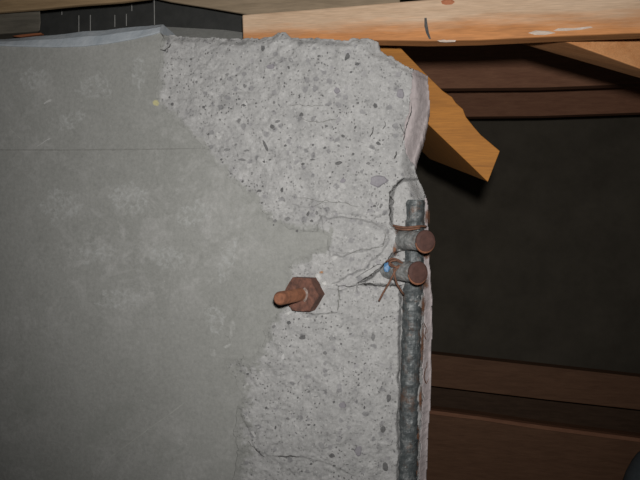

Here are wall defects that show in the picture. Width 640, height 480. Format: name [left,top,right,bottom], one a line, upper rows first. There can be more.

spalling [155,32,435,480]
crack [303,178,405,315]